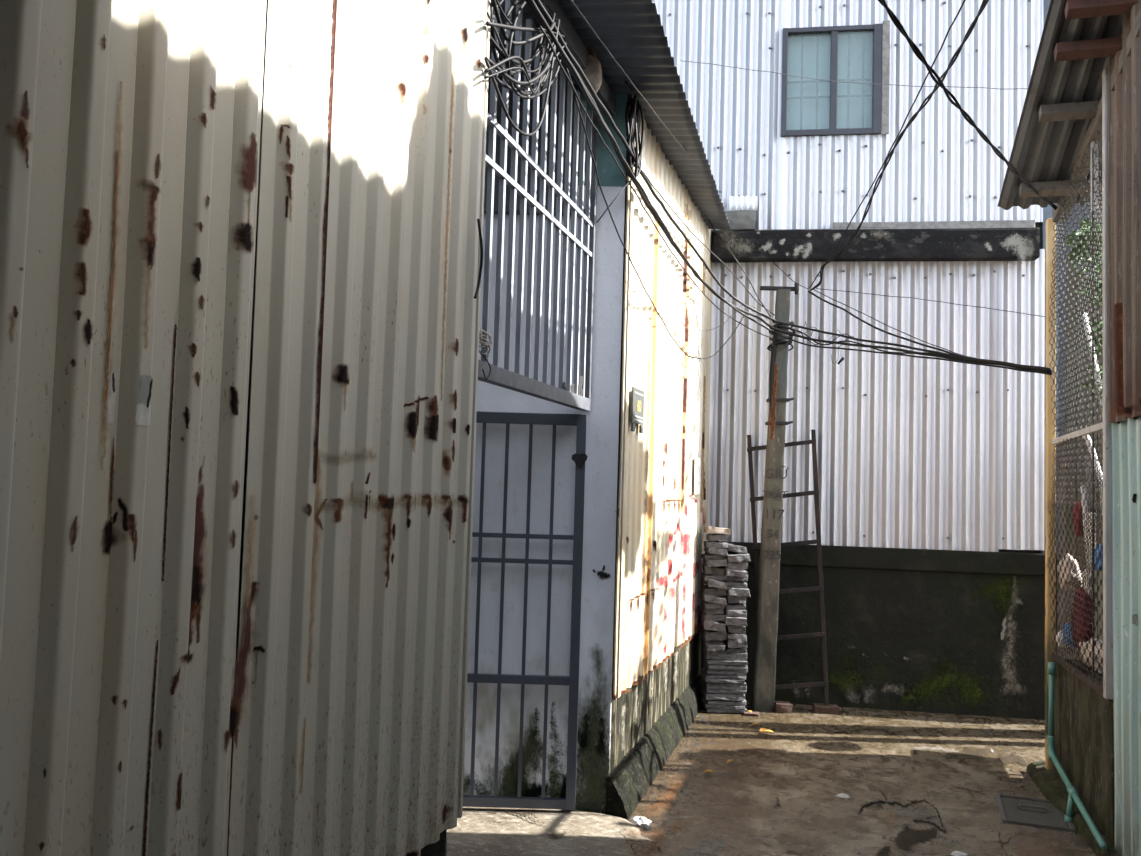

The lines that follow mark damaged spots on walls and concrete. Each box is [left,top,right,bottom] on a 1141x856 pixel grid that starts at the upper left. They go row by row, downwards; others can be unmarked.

corrosion [142,154,161,348]
corrosion [162,324,197,581]
corrosion [235,133,257,252]
corrosion [304,0,470,682]
corrosion [614,213,706,698]
corrosion [1106,0,1141,424]
corrosion [130,640,162,856]
corrosion [170,456,207,695]
corrosion [225,502,265,752]
damp [575,645,689,814]
crack [858,785,986,833]
damp [1000,576,1023,693]